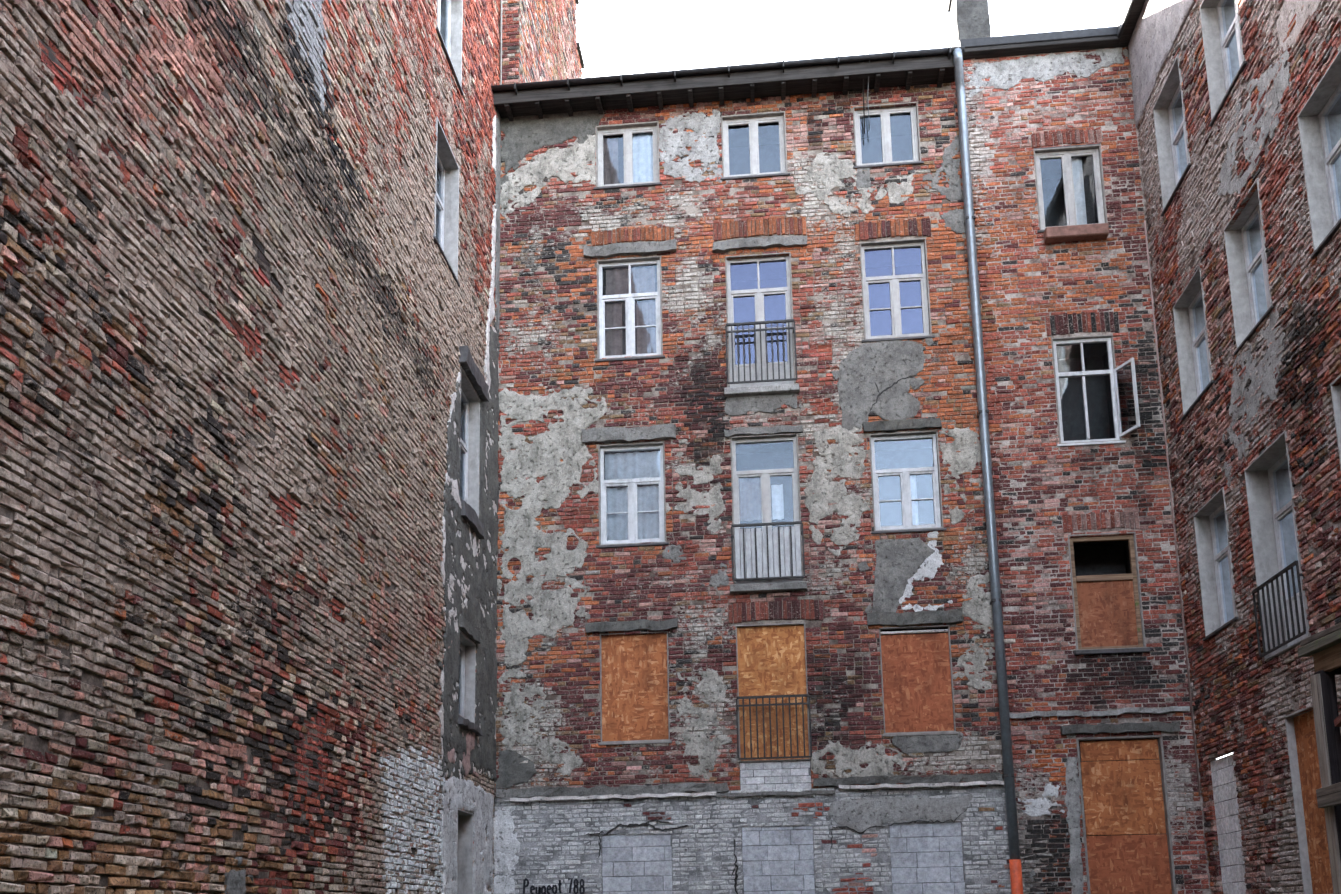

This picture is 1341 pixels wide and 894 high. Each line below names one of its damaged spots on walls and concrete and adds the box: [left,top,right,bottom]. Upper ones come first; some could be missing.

leakage [326,125,365,209]
flaking render [659,110,733,185]
flaking render [794,135,966,234]
flaking render [379,110,608,894]
flaking render [666,439,725,535]
flaking render [662,540,729,613]
flaking render [899,427,1005,690]
flaking render [671,666,733,779]
crack [586,819,688,859]